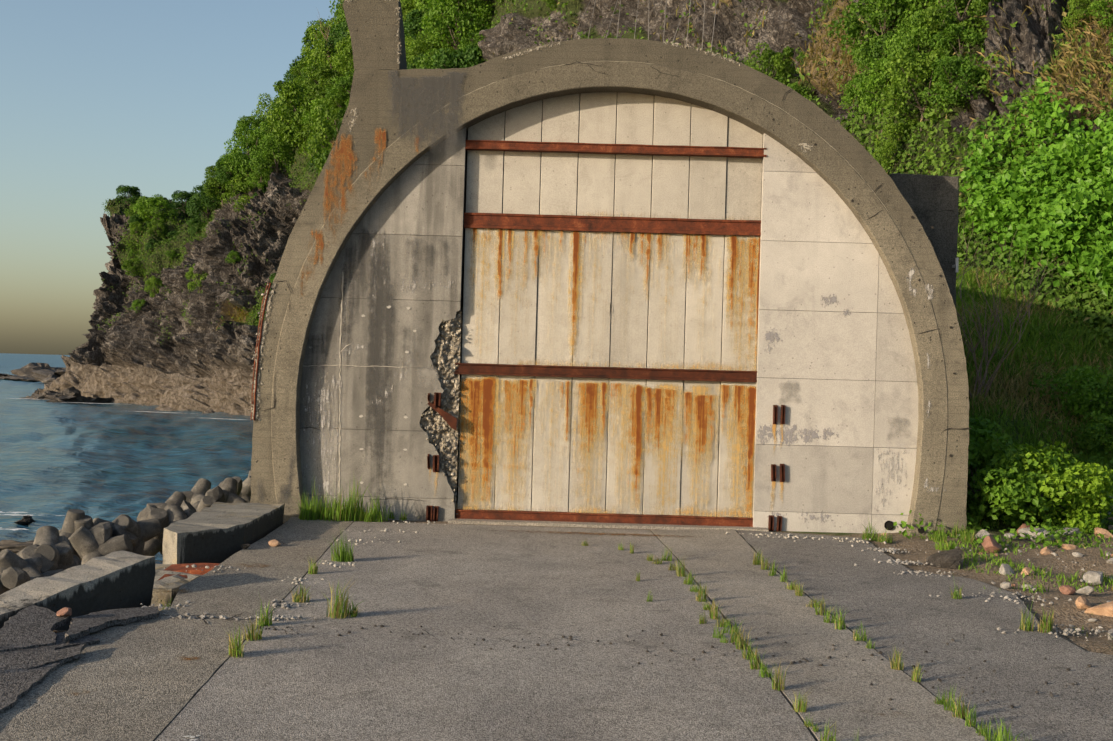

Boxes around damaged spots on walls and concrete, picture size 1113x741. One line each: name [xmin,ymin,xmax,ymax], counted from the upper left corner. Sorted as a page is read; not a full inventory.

leakage [281,376,342,501]
rust [301,135,366,286]
leakage [341,229,451,476]
spalling [372,310,461,514]
rust [473,228,595,355]
rust [458,377,756,518]
rust [621,232,668,282]
rust [661,234,760,371]